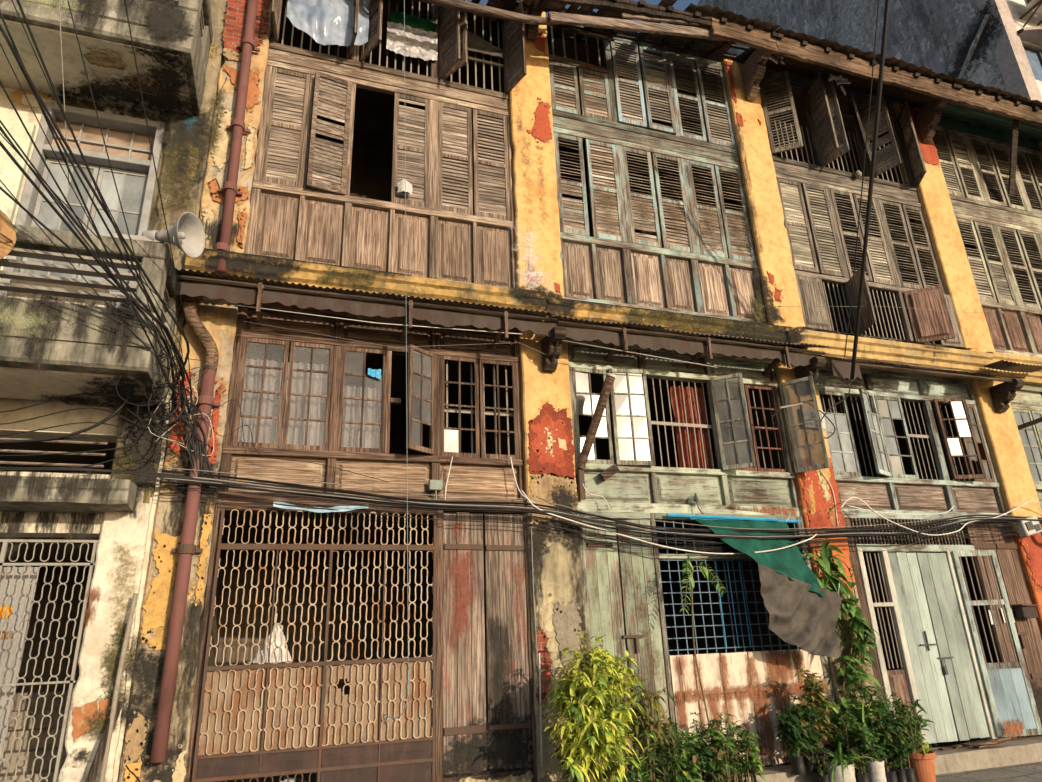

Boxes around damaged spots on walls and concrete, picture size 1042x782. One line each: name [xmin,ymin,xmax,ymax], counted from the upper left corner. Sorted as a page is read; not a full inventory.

water stain [48,0,213,230]
spalling [201,0,270,249]
water stain [319,269,375,287]
water stain [520,293,576,316]
peeling [527,401,580,529]
peeling [799,466,846,533]
peeling [141,533,181,651]
water stain [443,513,588,782]
peeling [61,699,110,782]
spalling [122,711,151,782]
spalling [172,744,187,782]
corrosion [674,650,827,765]